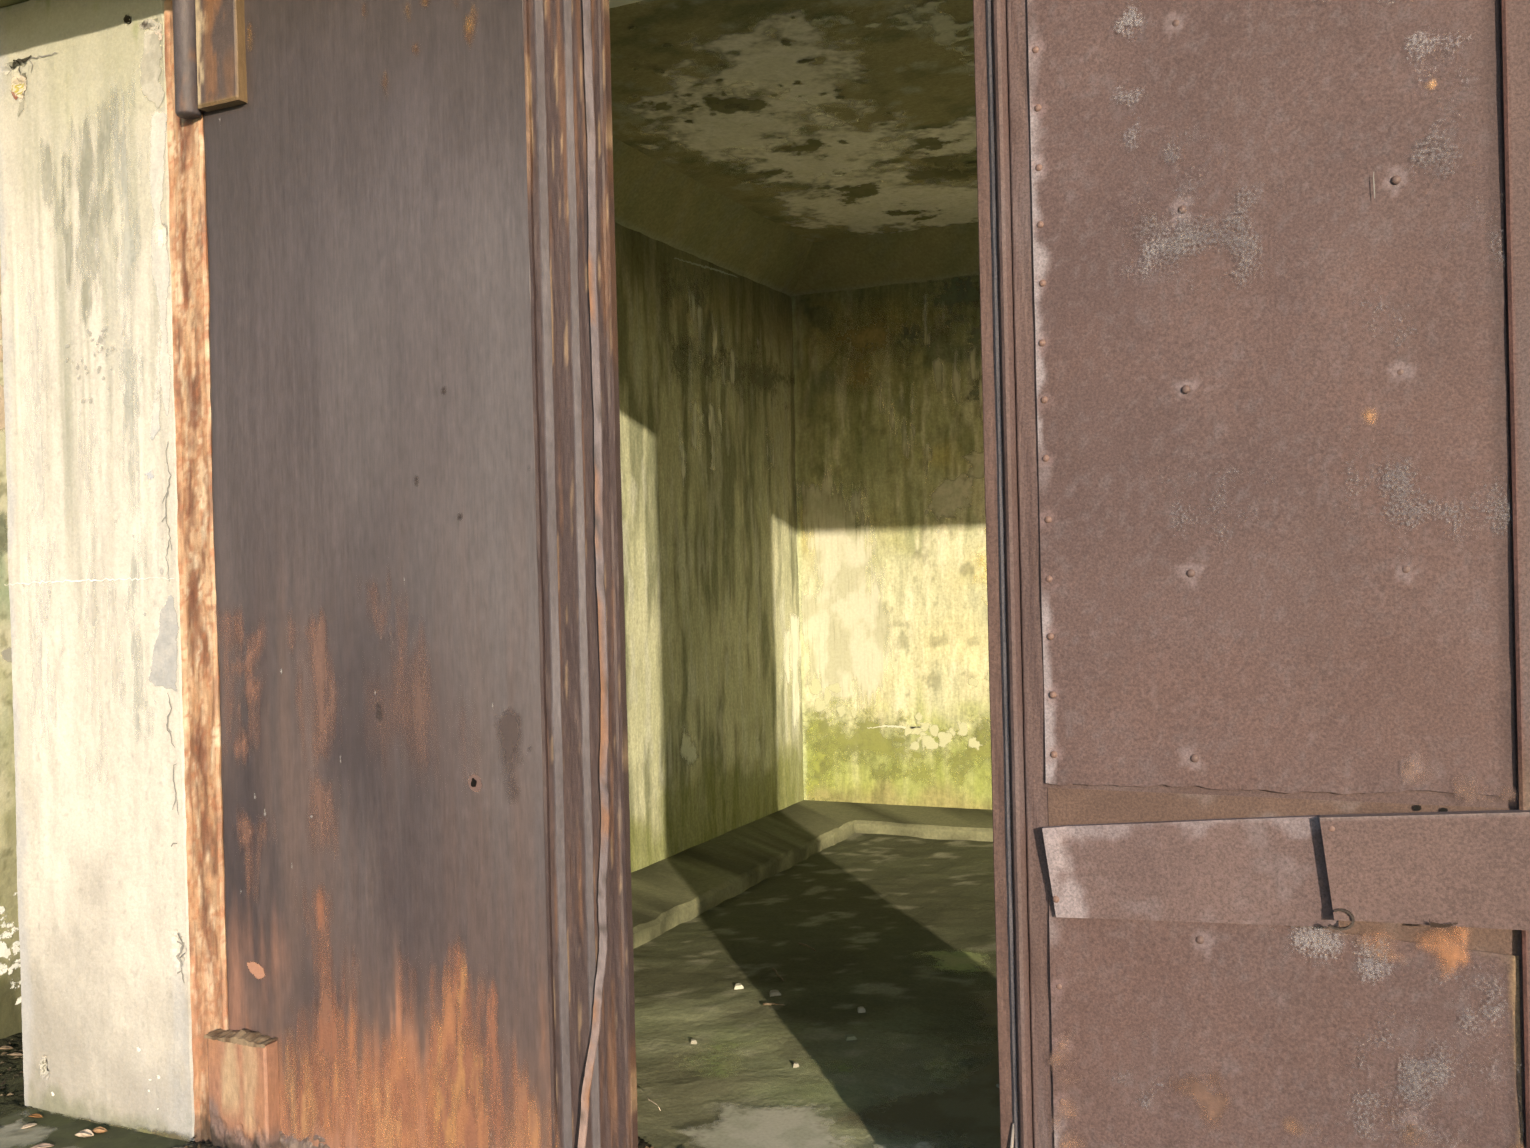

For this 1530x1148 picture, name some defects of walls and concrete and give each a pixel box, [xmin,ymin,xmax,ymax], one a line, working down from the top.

water stain [633,51,802,123]
water stain [748,139,880,206]
water stain [900,137,977,181]
water stain [41,95,141,507]
water stain [890,276,983,421]
water stain [88,557,146,737]
corrosion [223,613,261,704]
corrosion [289,612,335,758]
corrosion [238,816,252,890]
corrosion [284,892,370,1148]
corrosion [417,949,551,1148]
corrosion [1424,927,1467,974]